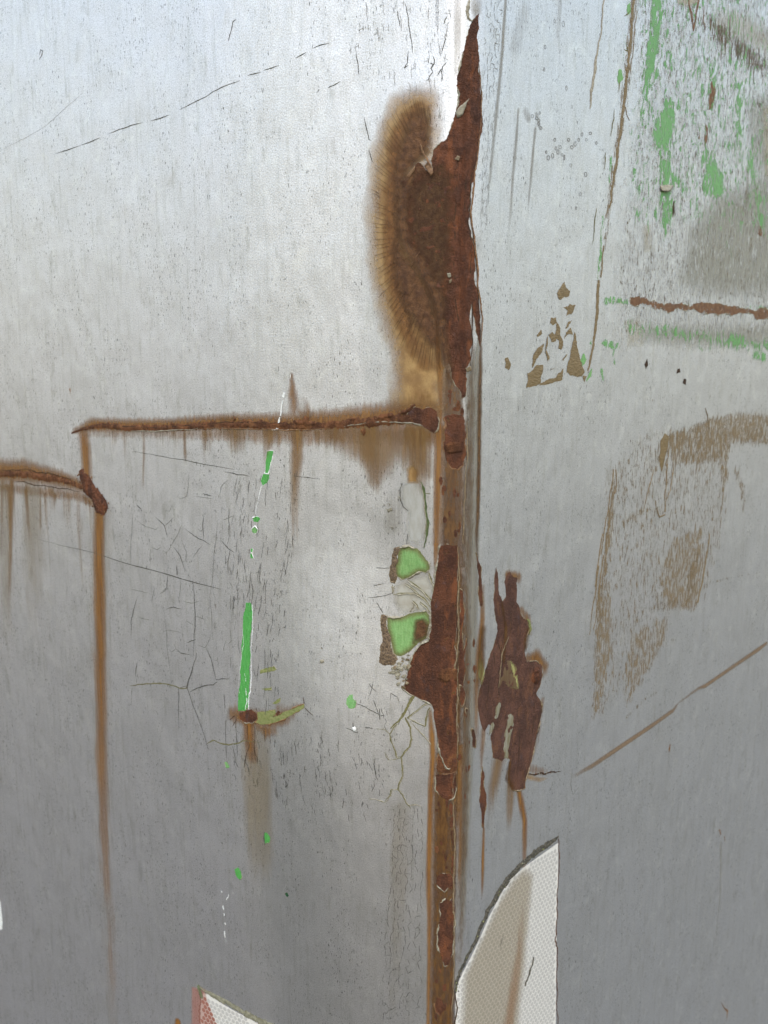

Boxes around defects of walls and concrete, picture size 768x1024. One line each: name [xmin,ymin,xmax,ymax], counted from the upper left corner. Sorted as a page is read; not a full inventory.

corrosion [77,431,105,805]
crack [42,451,431,1019]
leakage [75,375,444,493]
peeling [369,534,435,689]
corrosion [372,0,551,1024]
peeling [526,282,587,388]
peeling [600,0,768,380]